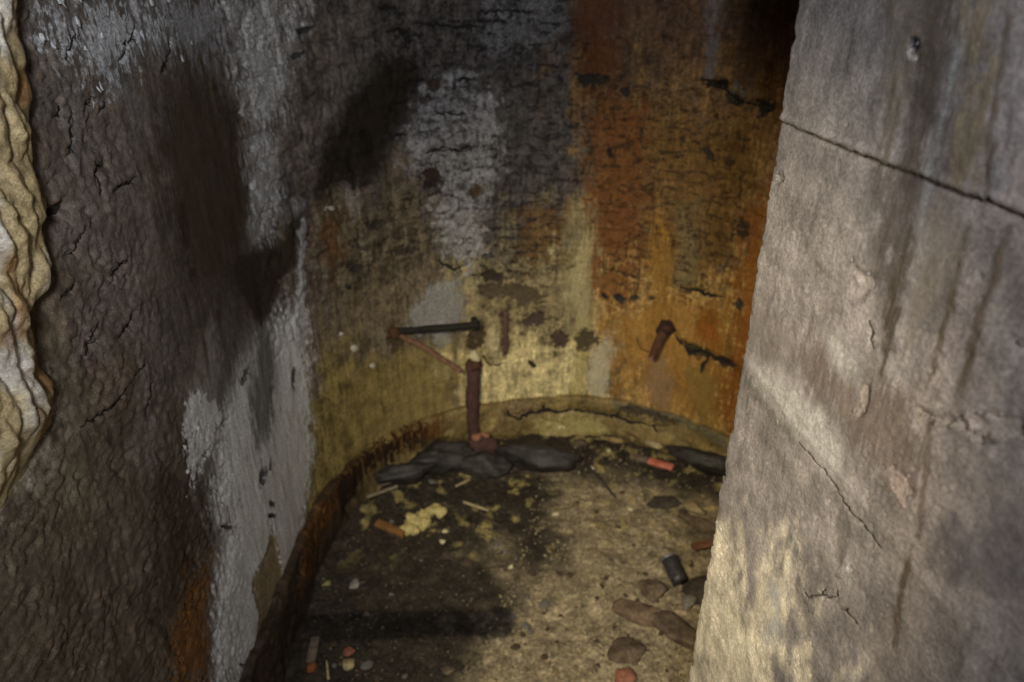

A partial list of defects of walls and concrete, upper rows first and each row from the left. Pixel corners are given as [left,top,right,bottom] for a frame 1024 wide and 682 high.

rust [759,0,799,120]
crack [53,95,137,195]
crack [703,80,1024,216]
crack [46,204,60,216]
water stain [152,0,314,449]
rust [602,184,770,433]
crack [500,404,673,439]
crack [799,441,881,548]
crack [805,589,857,624]